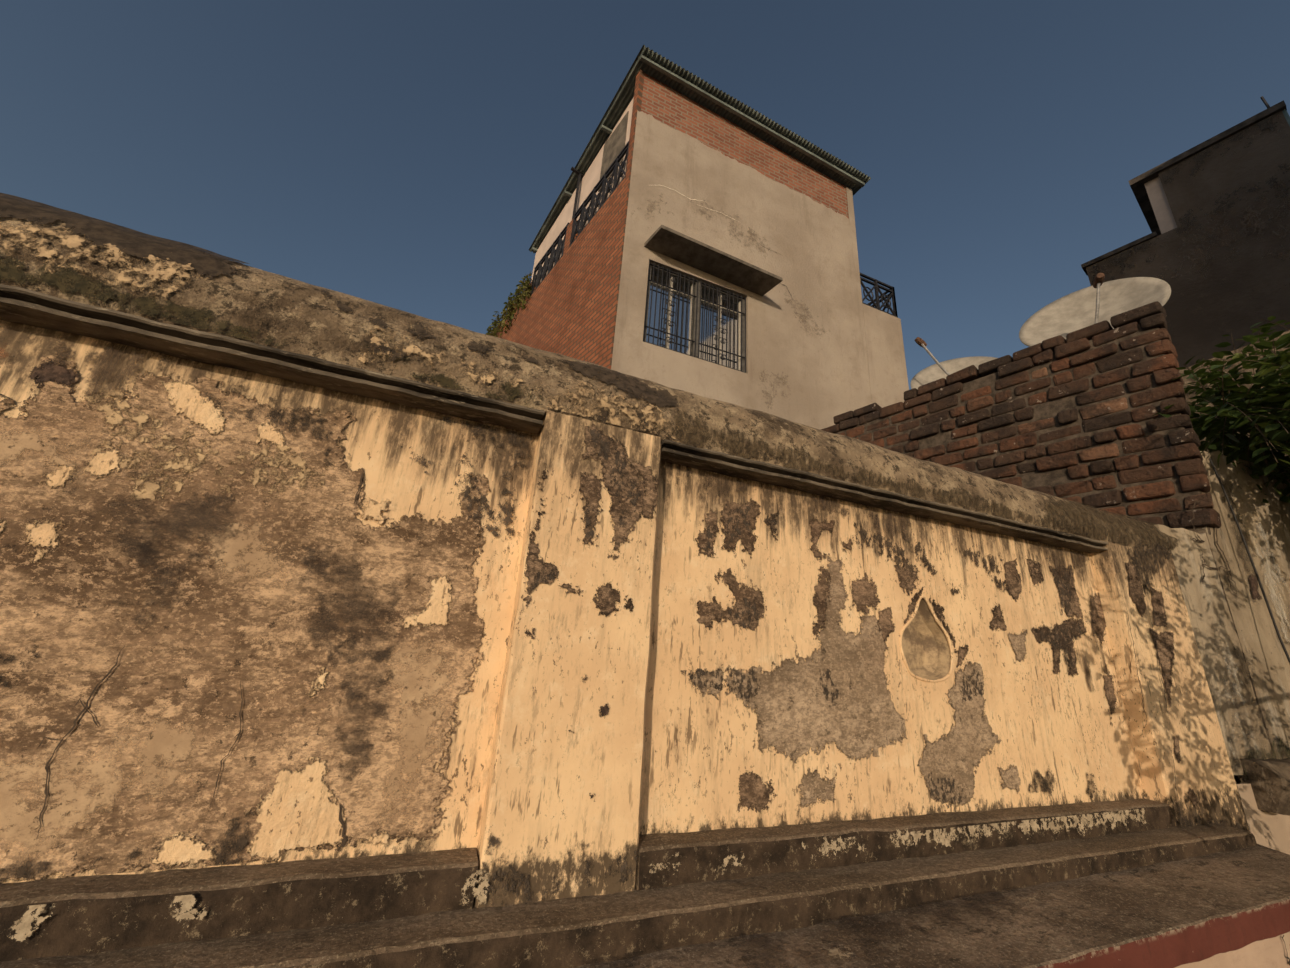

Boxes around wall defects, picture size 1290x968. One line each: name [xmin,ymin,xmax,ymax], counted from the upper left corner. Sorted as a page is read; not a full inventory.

leakage [0,193,249,278]
leakage [53,335,144,395]
crack [36,645,125,840]
leakage [111,494,234,562]
peeling [0,353,491,883]
leakage [300,547,396,780]
peeling [521,463,634,617]
peeling [547,381,679,559]
peeling [695,498,780,631]
peeling [681,519,1021,813]
peeling [989,558,1106,676]
leakage [1221,478,1290,641]